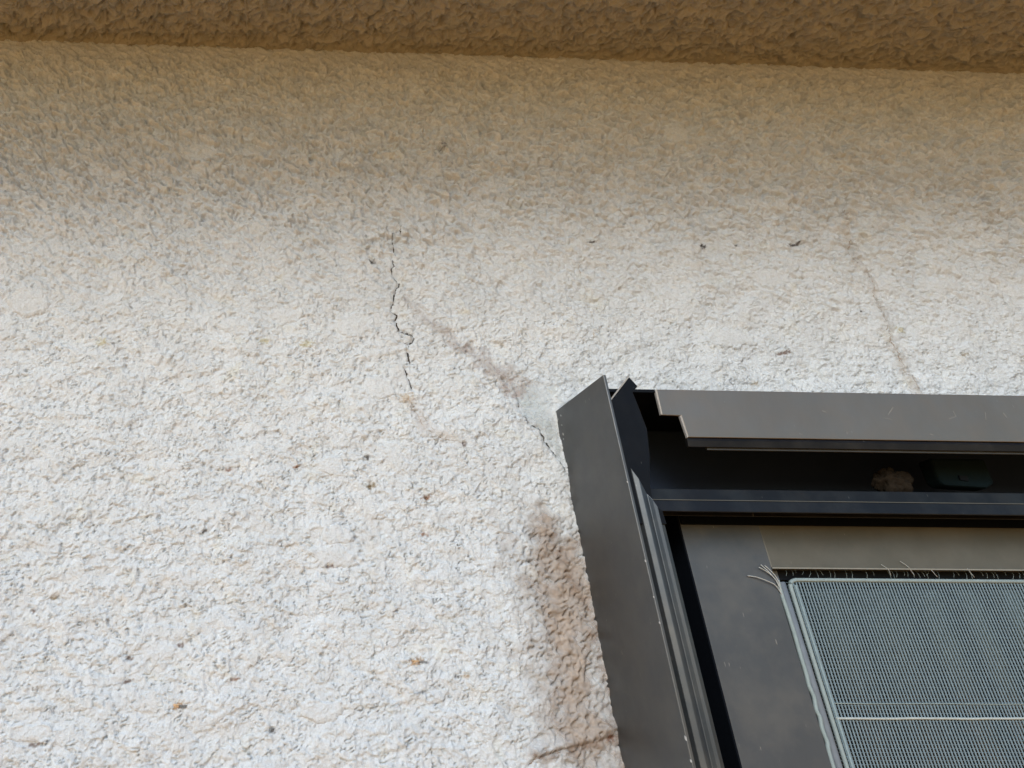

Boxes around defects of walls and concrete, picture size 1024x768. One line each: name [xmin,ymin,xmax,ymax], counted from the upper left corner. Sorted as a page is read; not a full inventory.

crack [391,229,463,444]